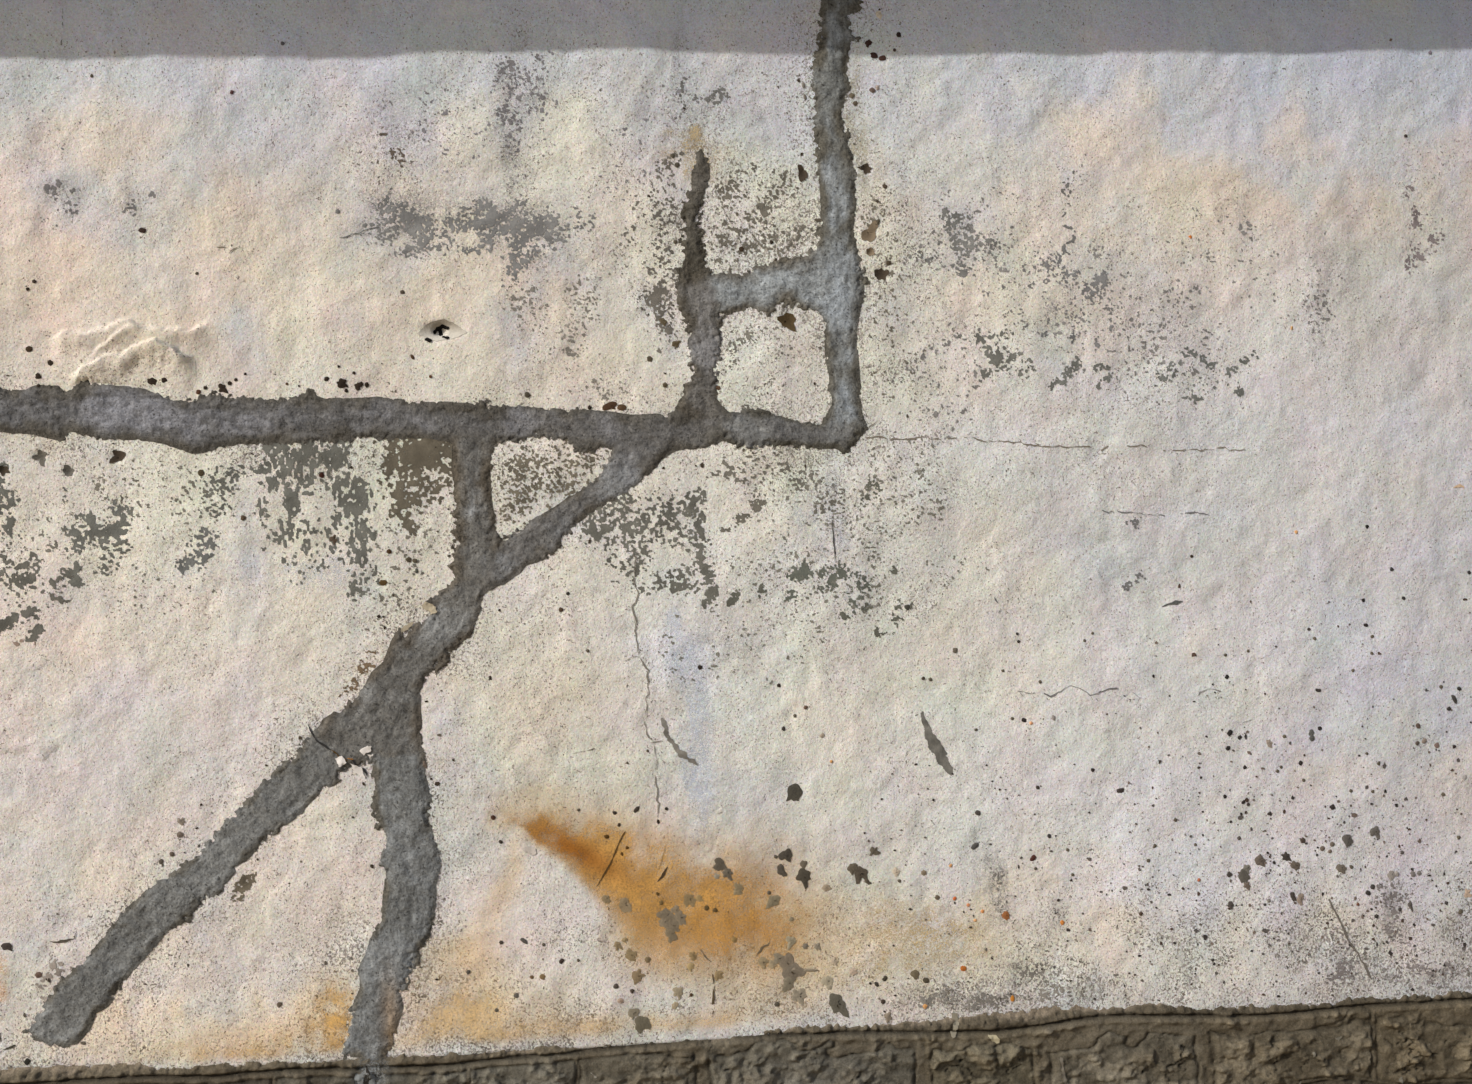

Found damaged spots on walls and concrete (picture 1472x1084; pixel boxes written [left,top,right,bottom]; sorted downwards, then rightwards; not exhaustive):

peeling [360,33,728,401]
peeling [579,162,1343,692]
peeling [0,438,453,646]
crack [308,725,368,778]
peeling [338,650,376,697]
crack [625,550,660,817]
corrosion [522,816,788,961]
corrosion [424,993,521,1039]
crack [698,947,715,1017]